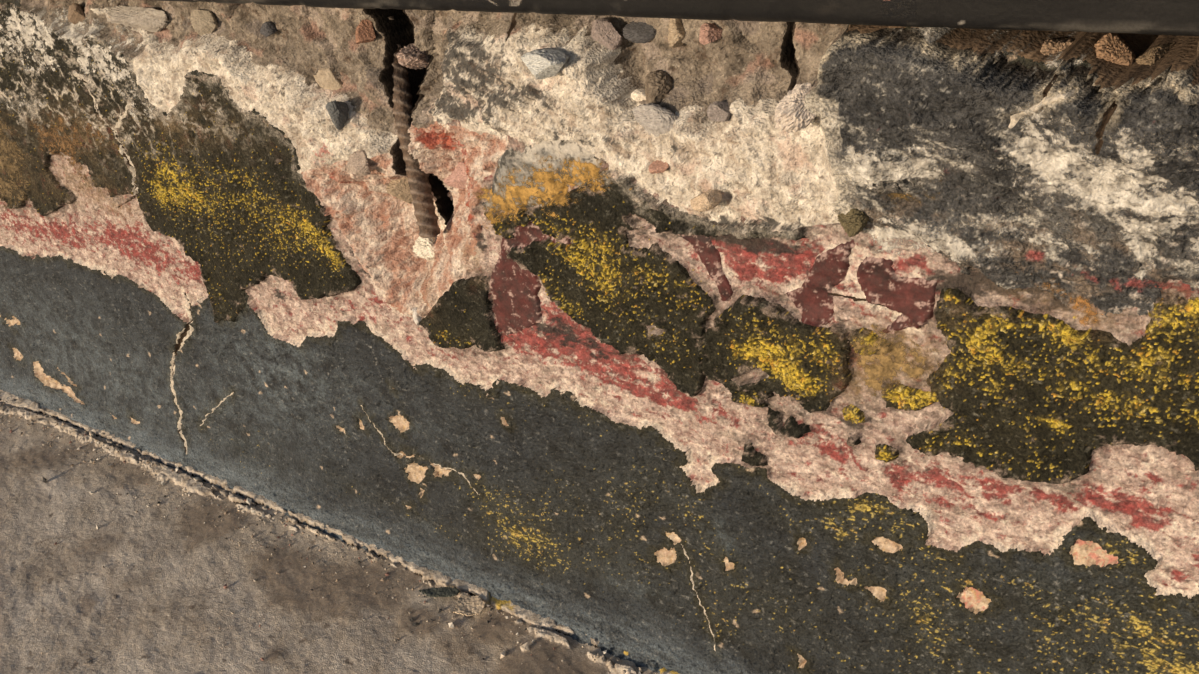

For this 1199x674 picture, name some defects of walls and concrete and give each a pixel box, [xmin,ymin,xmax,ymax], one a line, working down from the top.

peeling [0,0,440,347]
crack [1008,32,1090,129]
crack [1094,100,1117,155]
peeling [12,348,84,405]
crack [30,293,316,528]
peeling [301,9,1199,602]